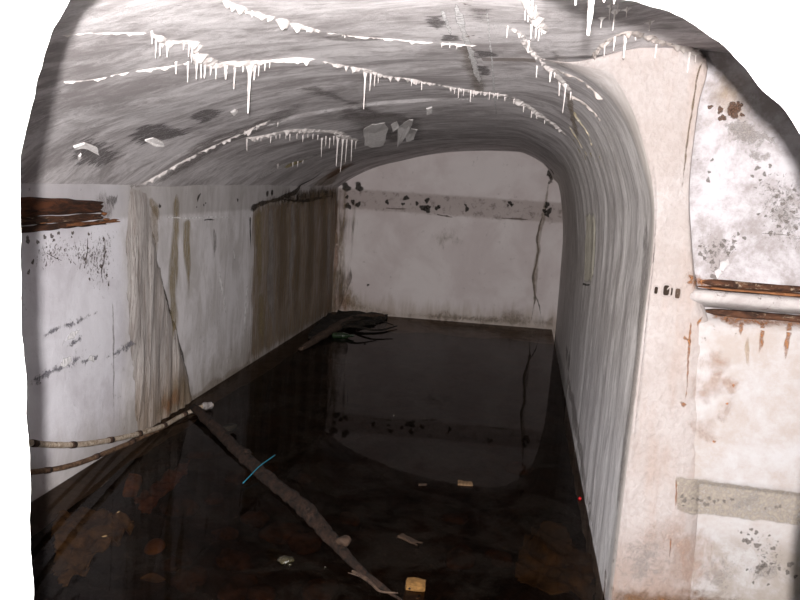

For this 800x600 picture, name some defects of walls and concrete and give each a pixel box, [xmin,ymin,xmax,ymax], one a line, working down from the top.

efflorescence [62,0,603,160]
efflorescence [141,120,358,185]
peeling [363,119,417,148]
spalling [708,101,800,242]
mould [385,195,450,217]
water stain [244,182,363,358]
crack [532,219,542,309]
peeling [698,232,746,280]
crack [157,266,188,376]
corrosion [684,318,702,381]
corrosion [714,315,800,349]